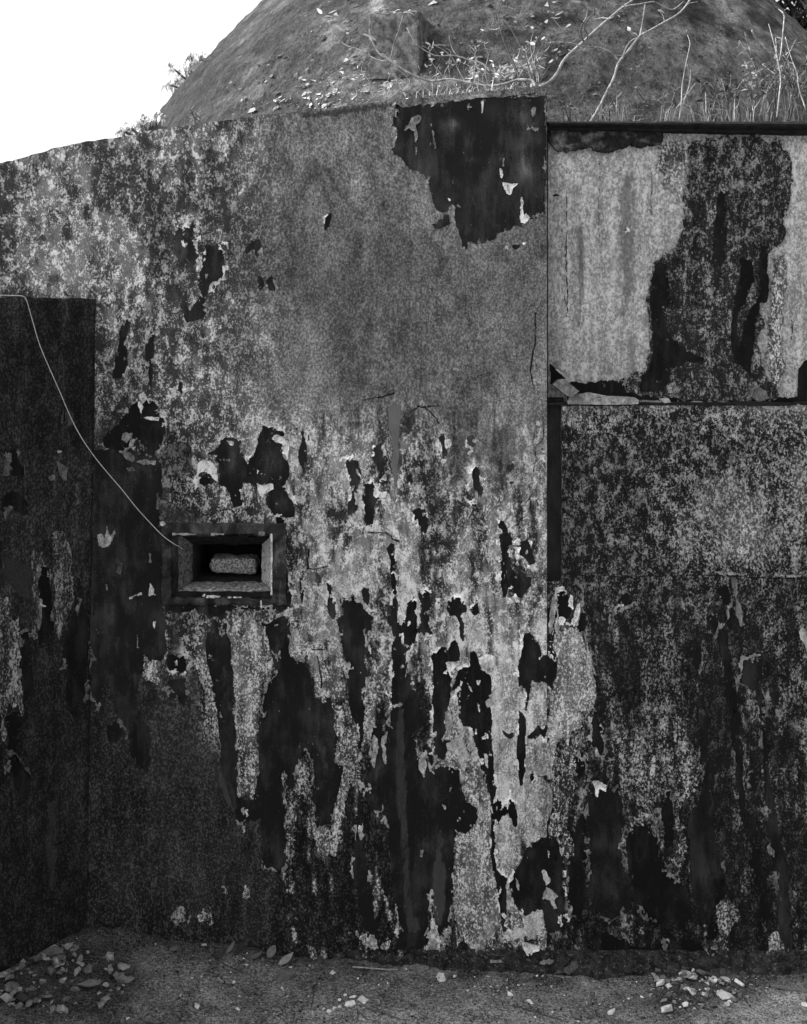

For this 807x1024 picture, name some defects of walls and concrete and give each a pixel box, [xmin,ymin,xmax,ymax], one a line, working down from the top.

peeling [390,93,559,254]
peeling [172,220,229,327]
peeling [708,190,769,374]
peeling [752,360,807,403]
peeling [0,327,344,872]
peeling [495,518,537,603]
leakage [395,709,420,933]
leakage [432,831,446,926]
peeling [322,543,728,975]